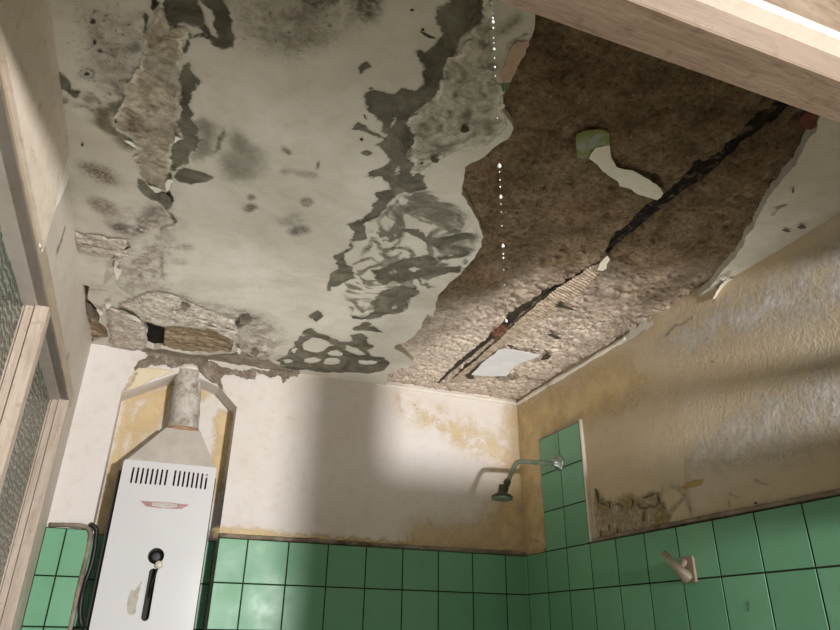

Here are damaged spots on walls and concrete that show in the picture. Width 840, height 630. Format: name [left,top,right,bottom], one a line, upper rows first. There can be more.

leakage [59,72,92,107]
leakage [84,10,137,148]
leakage [142,0,235,53]
leakage [170,63,224,185]
leakage [112,179,177,235]
peeling [75,0,283,372]
leakage [277,0,484,374]
spalling [387,0,840,400]
flaking render [594,489,668,537]